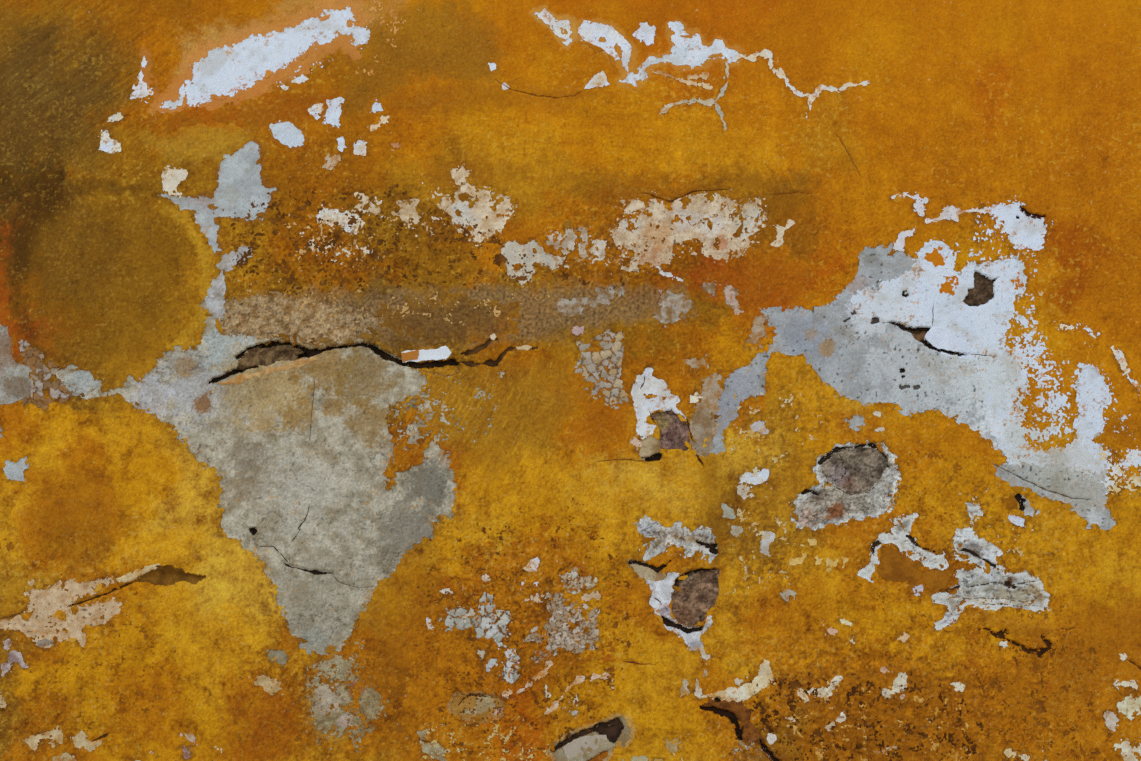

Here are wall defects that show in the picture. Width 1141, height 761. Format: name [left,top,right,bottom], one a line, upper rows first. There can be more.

peeling [130,0,419,116]
peeling [488,8,870,130]
peeling [98,112,123,154]
peeling [269,120,309,148]
peeling [308,97,390,182]
crack [209,334,538,385]
flaking render [0,141,795,761]
peeling [572,192,1141,761]